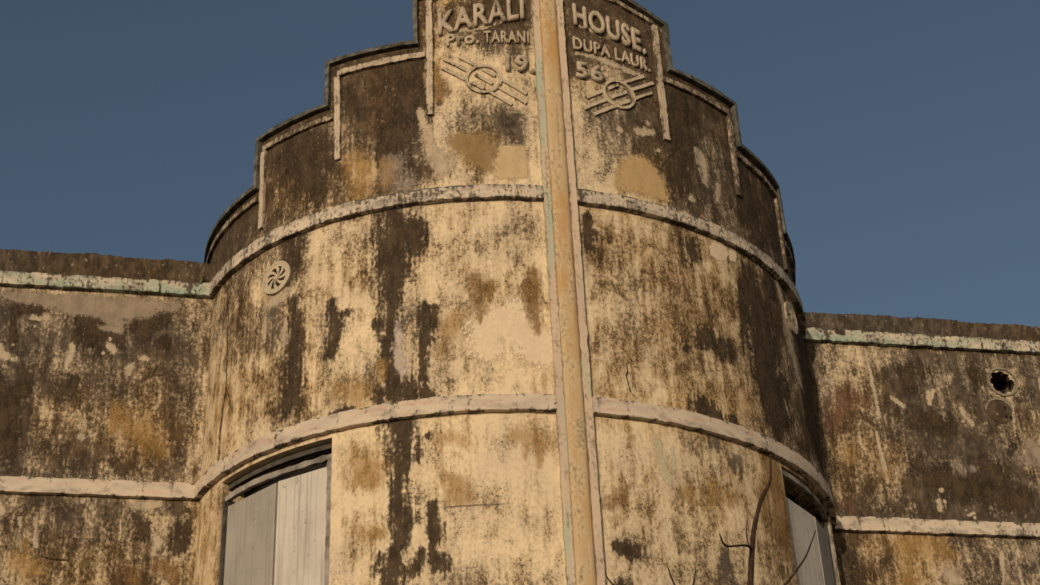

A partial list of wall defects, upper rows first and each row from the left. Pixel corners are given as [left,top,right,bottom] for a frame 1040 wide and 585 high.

leakage [274,119,335,208]
leakage [341,81,359,122]
leakage [374,47,440,191]
leakage [661,71,779,255]
leakage [0,364,33,462]
leakage [5,293,50,350]
leakage [369,207,439,387]
leakage [581,210,598,254]
leakage [679,235,702,266]
leakage [680,260,824,473]
leakage [864,352,957,484]
leakage [370,418,452,585]